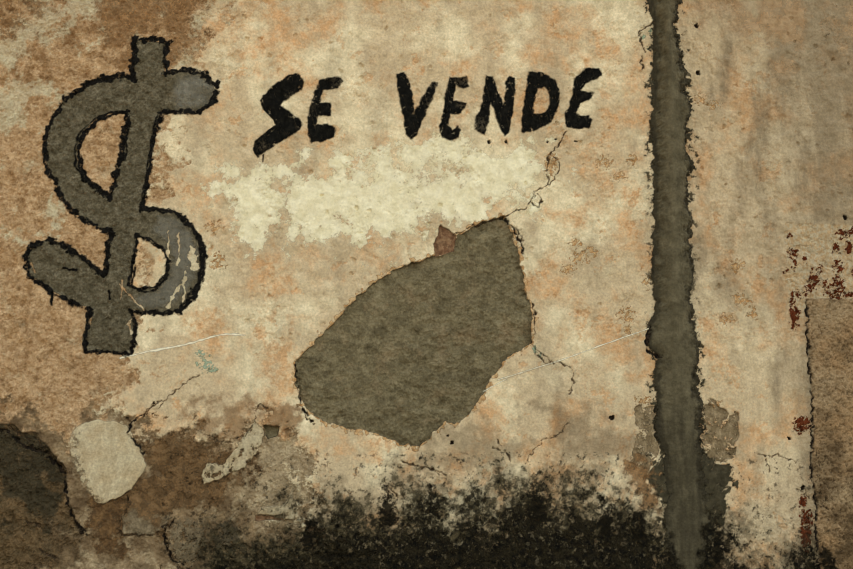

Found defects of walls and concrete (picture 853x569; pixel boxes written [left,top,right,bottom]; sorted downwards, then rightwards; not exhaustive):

crack [454,132,566,254]
spalling [292,213,538,452]
flaking render [201,421,280,484]
peeling [700,399,739,463]
flaking render [122,508,170,536]
damp [85,429,266,560]
flaking render [255,489,295,521]
damp [197,455,682,569]
damp [697,507,752,569]
damp [759,540,838,569]